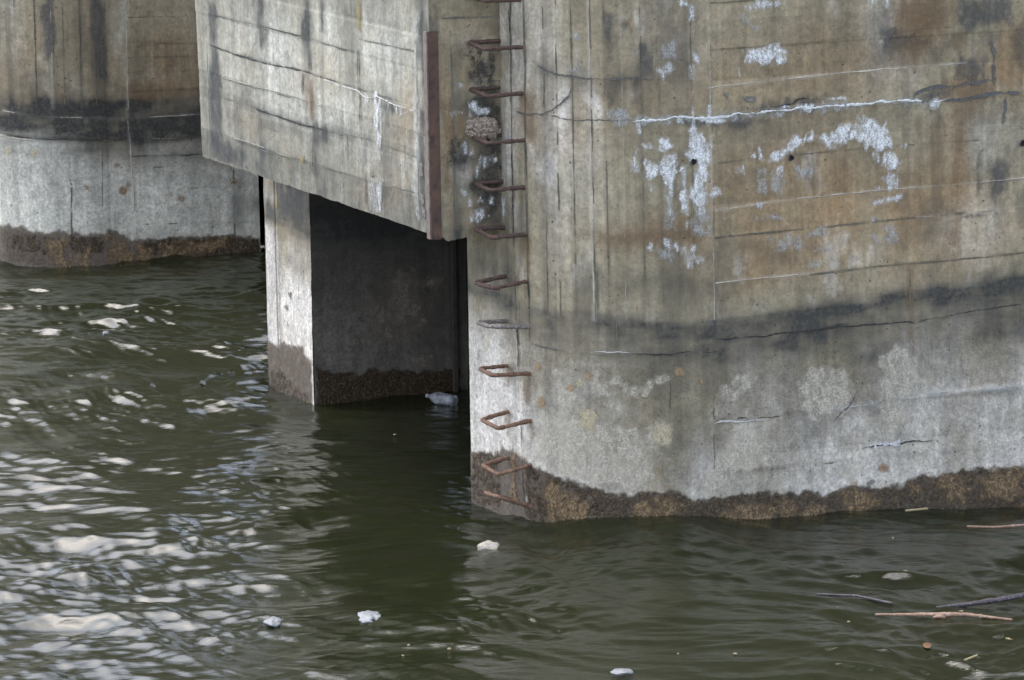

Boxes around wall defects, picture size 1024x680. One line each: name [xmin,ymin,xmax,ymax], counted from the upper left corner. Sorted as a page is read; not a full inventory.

crack [211,45,405,165]
water stain [460,49,501,120]
crack [508,5,1022,134]
water stain [745,44,786,64]
water stain [463,129,517,223]
water stain [633,119,719,267]
water stain [753,118,901,207]
crack [516,282,562,372]
crack [595,304,1020,356]
crack [713,392,780,424]